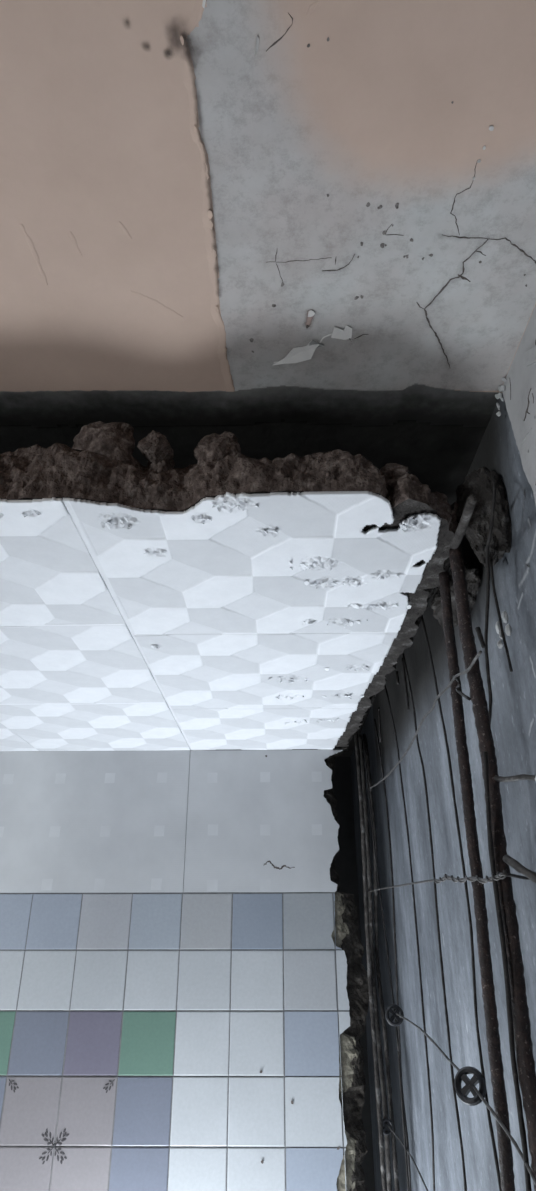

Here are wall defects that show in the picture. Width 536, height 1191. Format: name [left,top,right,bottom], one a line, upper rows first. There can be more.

peeling [178,0,536,416]
crack [417,160,535,367]
spalling [323,751,374,1191]